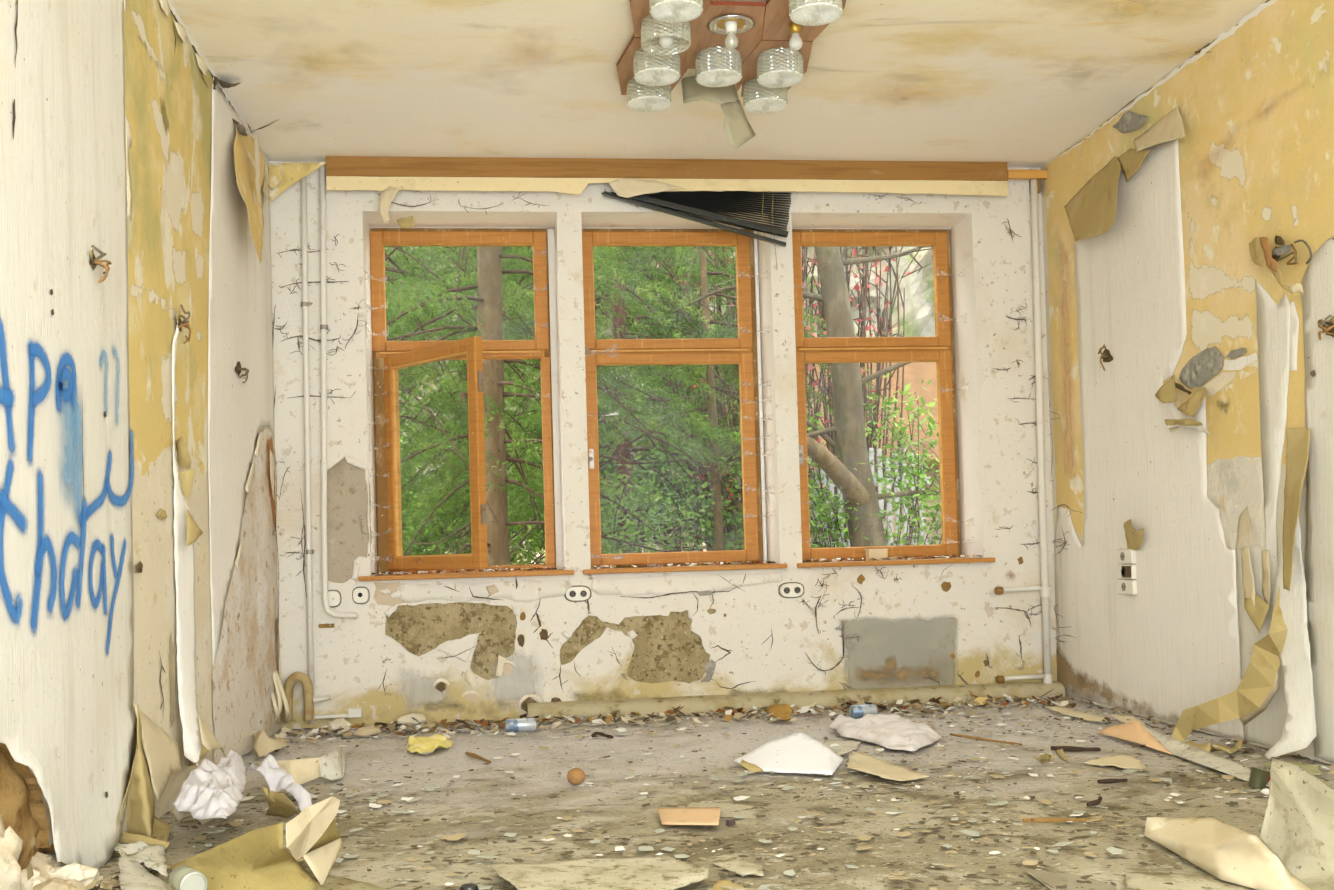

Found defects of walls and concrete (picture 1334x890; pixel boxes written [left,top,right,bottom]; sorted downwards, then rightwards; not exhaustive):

crack [12,0,20,66]
crack [10,99,18,139]
peeling [1045,0,1334,612]
peeling [124,0,290,811]
spalling [327,455,372,583]
spalling [374,572,783,701]
spalling [0,747,47,890]